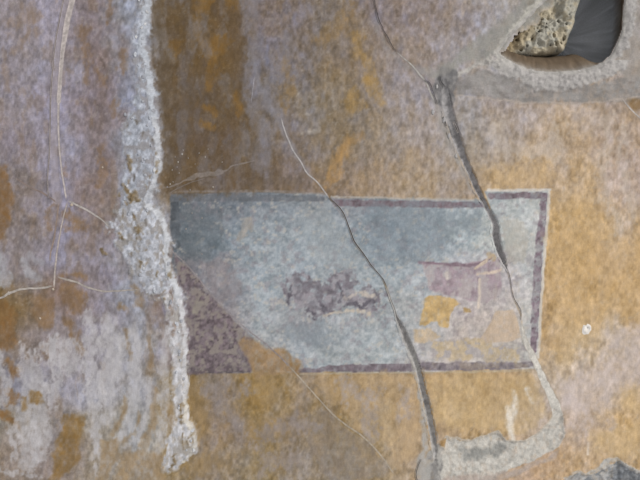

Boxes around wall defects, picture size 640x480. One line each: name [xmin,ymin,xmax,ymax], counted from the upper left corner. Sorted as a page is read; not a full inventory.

crack [0,177,140,299]
leakage [0,0,322,480]
crack [170,250,395,480]
crack [245,51,445,480]
crack [370,0,564,421]